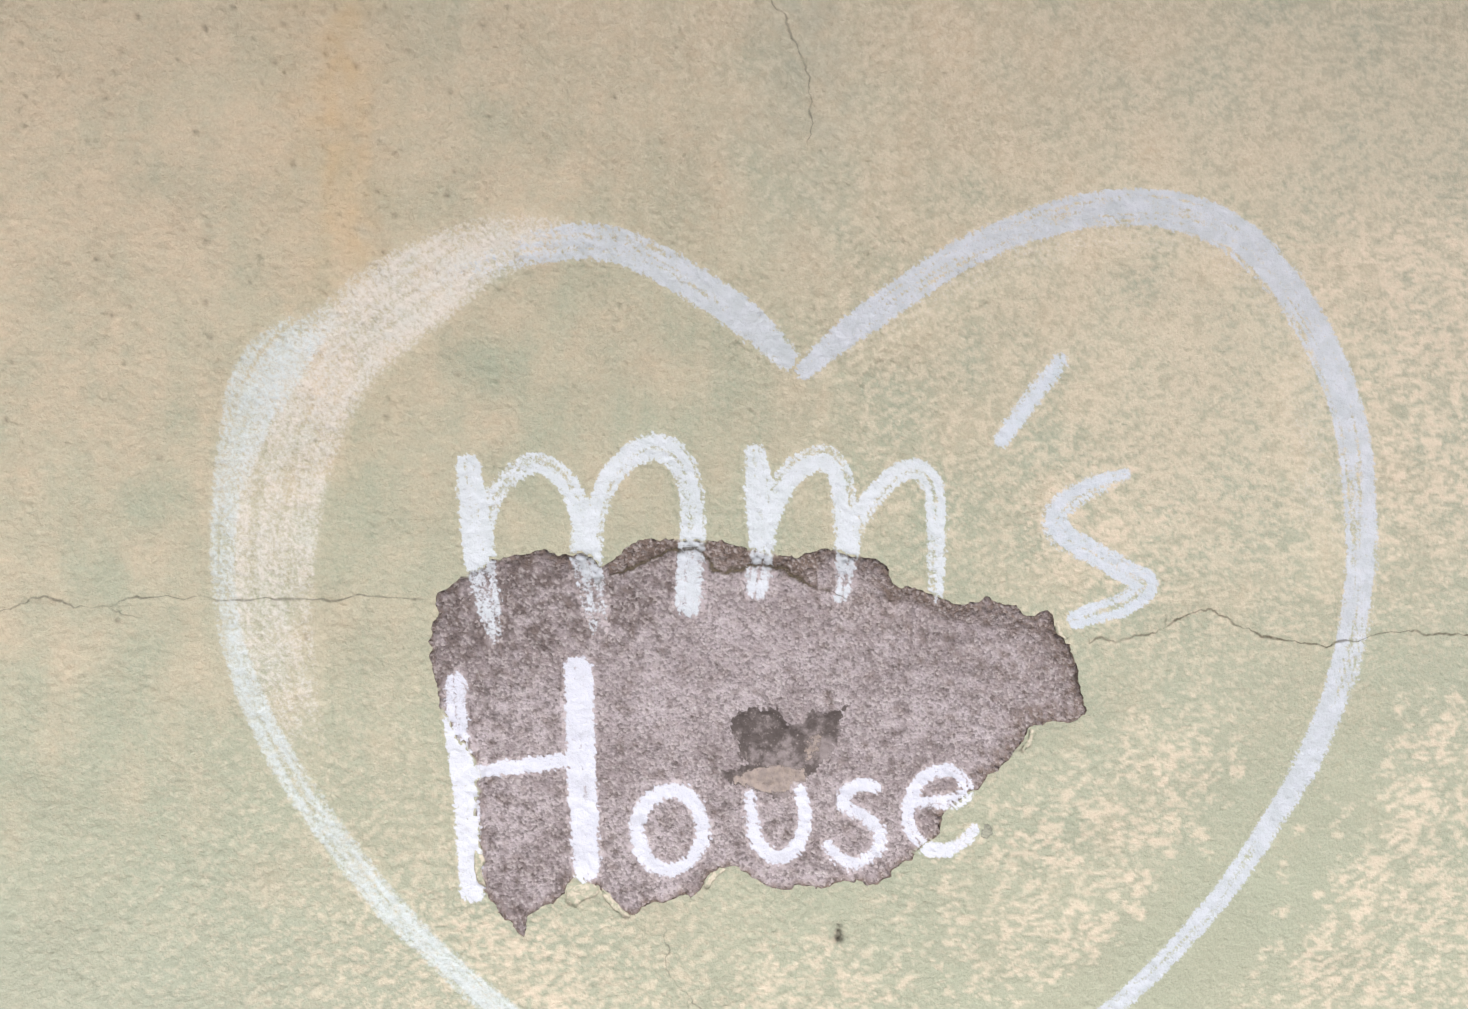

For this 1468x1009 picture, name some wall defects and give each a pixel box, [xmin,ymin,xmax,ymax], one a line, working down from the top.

peeling [419,538,1273,1009]